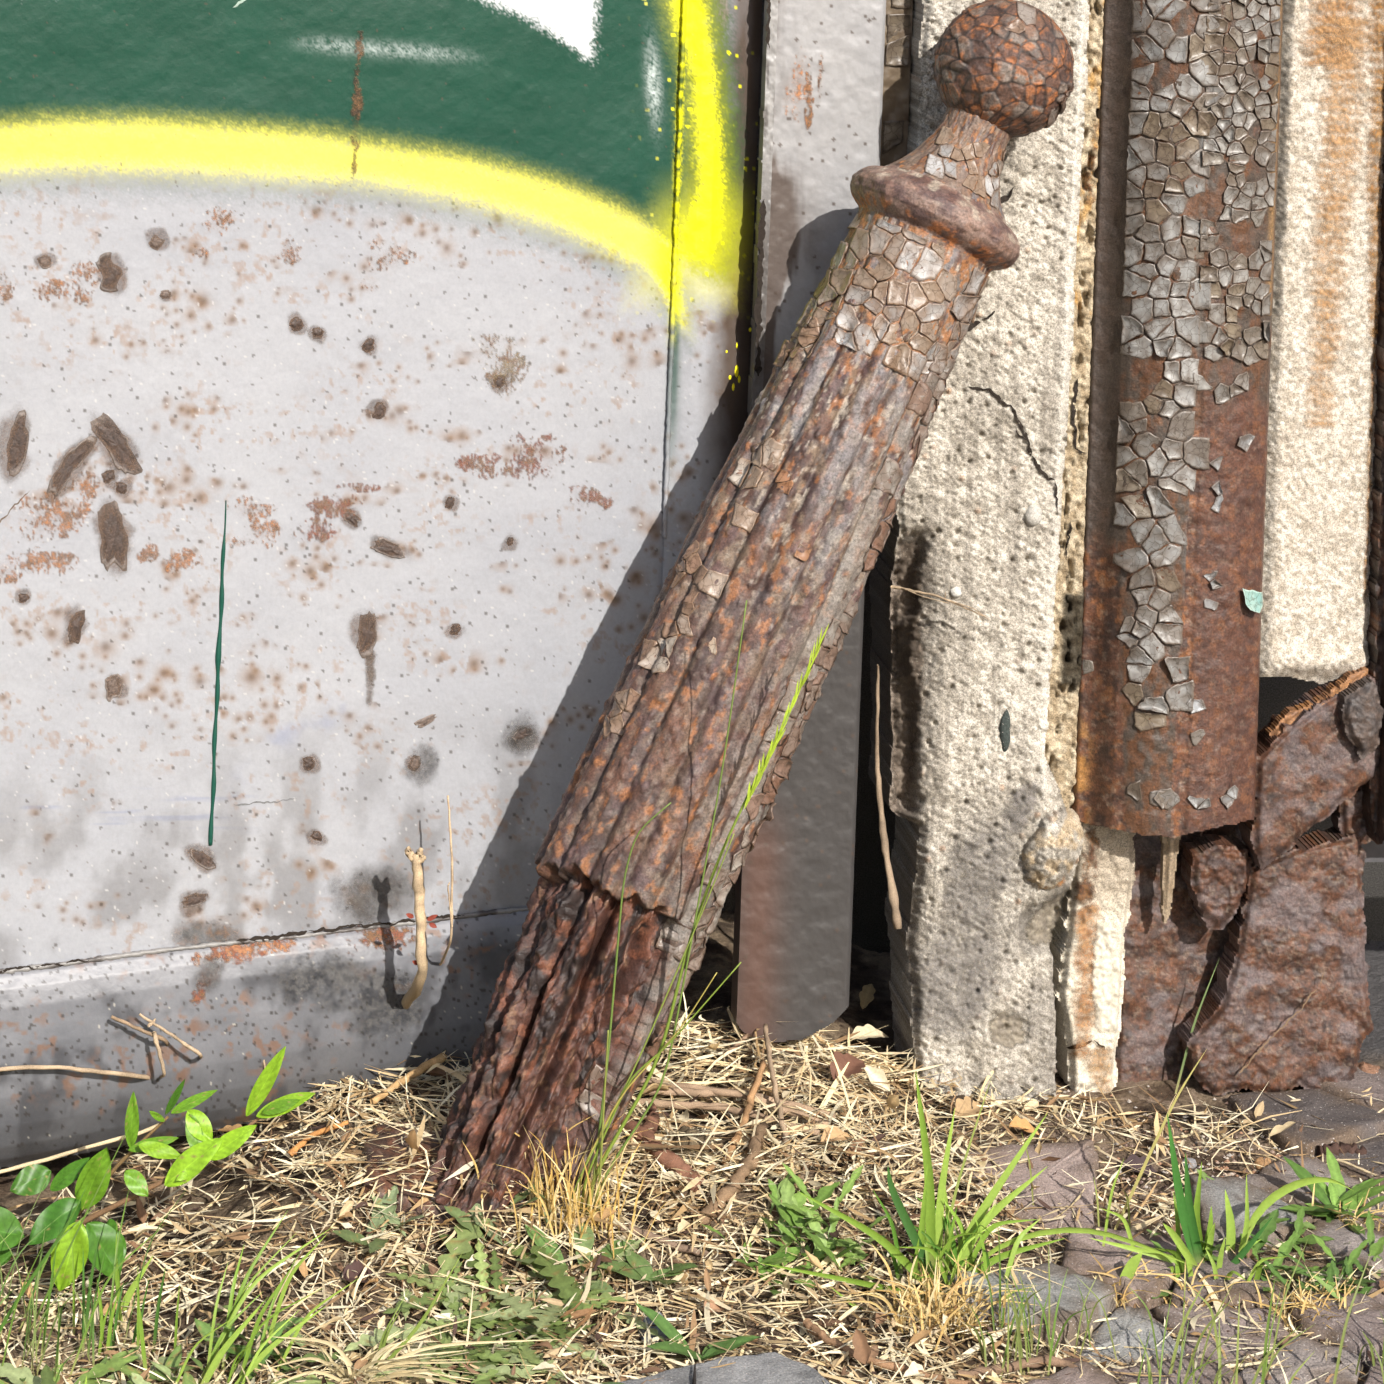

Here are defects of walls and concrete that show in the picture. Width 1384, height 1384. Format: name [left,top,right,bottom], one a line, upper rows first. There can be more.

corrosion [33,252,124,304]
corrosion [1308,0,1384,466]
crack [1071,379,1085,453]
peeling [1113,0,1281,746]
corrosion [0,410,199,583]
corrosion [235,483,381,548]
corrosion [370,537,406,559]
crack [968,386,1072,557]
corrosion [352,611,377,702]
peeling [1077,658,1094,675]
peeling [1127,780,1239,810]
spalling [1092,923,1121,1032]